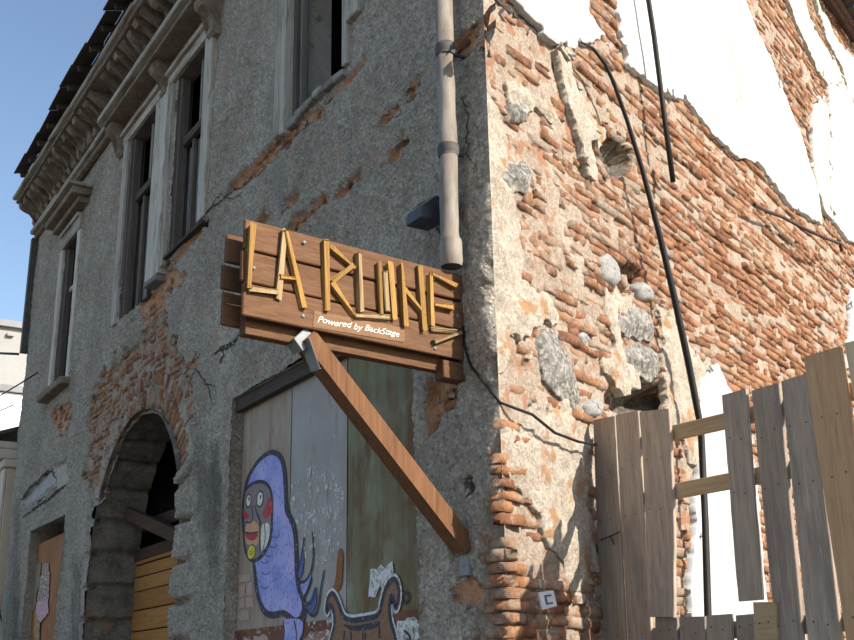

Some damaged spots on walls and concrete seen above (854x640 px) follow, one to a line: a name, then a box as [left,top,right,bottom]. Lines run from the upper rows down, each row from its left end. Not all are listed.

spalling [454,3,496,65]
peeling [508,0,633,183]
peeling [614,0,854,243]
crack [193,185,245,226]
spalling [81,218,210,513]
crack [213,335,239,363]
spalling [604,383,660,414]
peeling [699,363,732,418]
peeling [844,288,854,370]
peeling [692,430,728,480]
spalling [448,418,603,640]
peeling [683,485,768,621]